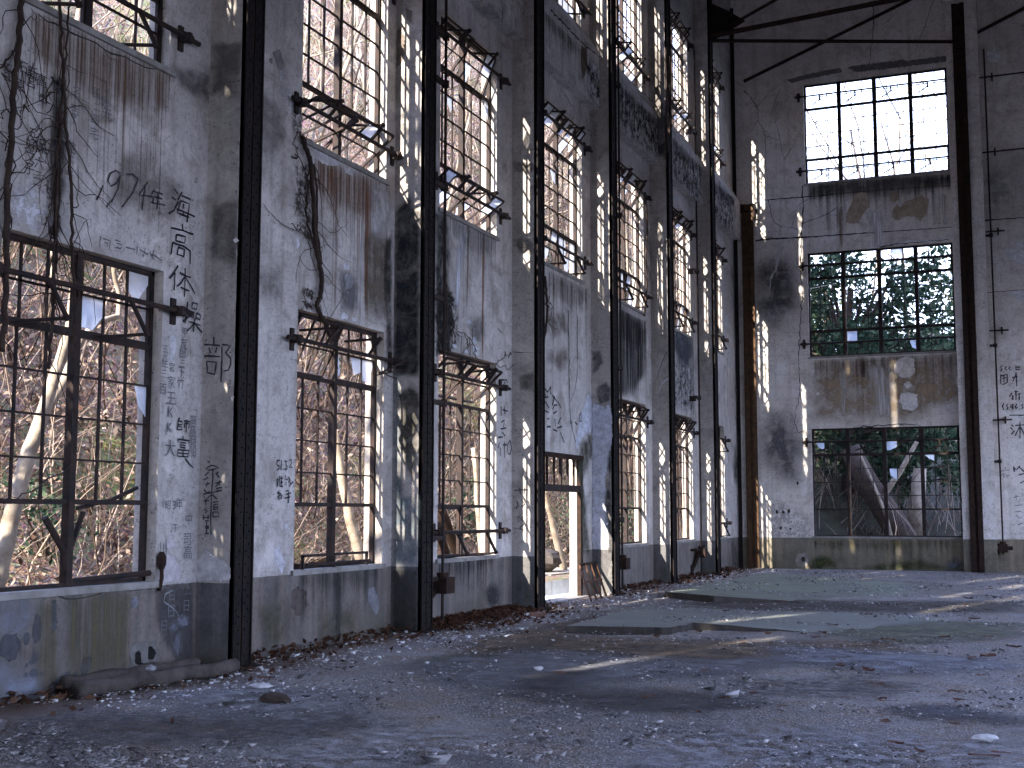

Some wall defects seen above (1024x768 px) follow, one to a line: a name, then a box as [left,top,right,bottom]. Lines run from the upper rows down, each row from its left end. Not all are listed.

rust [35,20,163,130]
peeling [846,192,870,224]
water stain [811,175,951,224]
peeling [890,191,929,221]
rust [319,168,390,305]
water stain [759,263,793,316]
water stain [817,359,958,416]
peeling [894,357,918,411]
spalling [0,600,93,693]